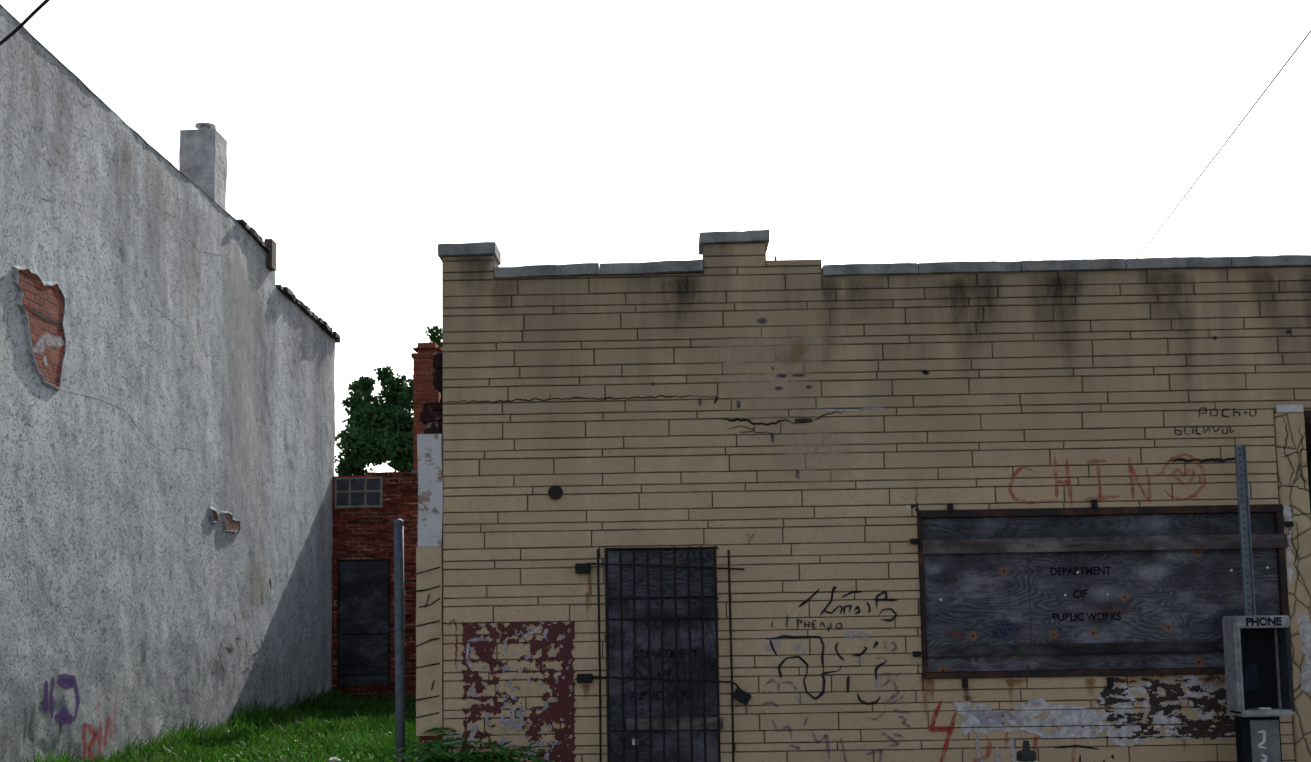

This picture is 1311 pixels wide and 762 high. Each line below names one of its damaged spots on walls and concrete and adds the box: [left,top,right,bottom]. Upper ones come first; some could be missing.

spalling [13,265,67,392]
crack [444,395,889,434]
peeling [415,621,576,762]
peeling [953,674,1236,748]